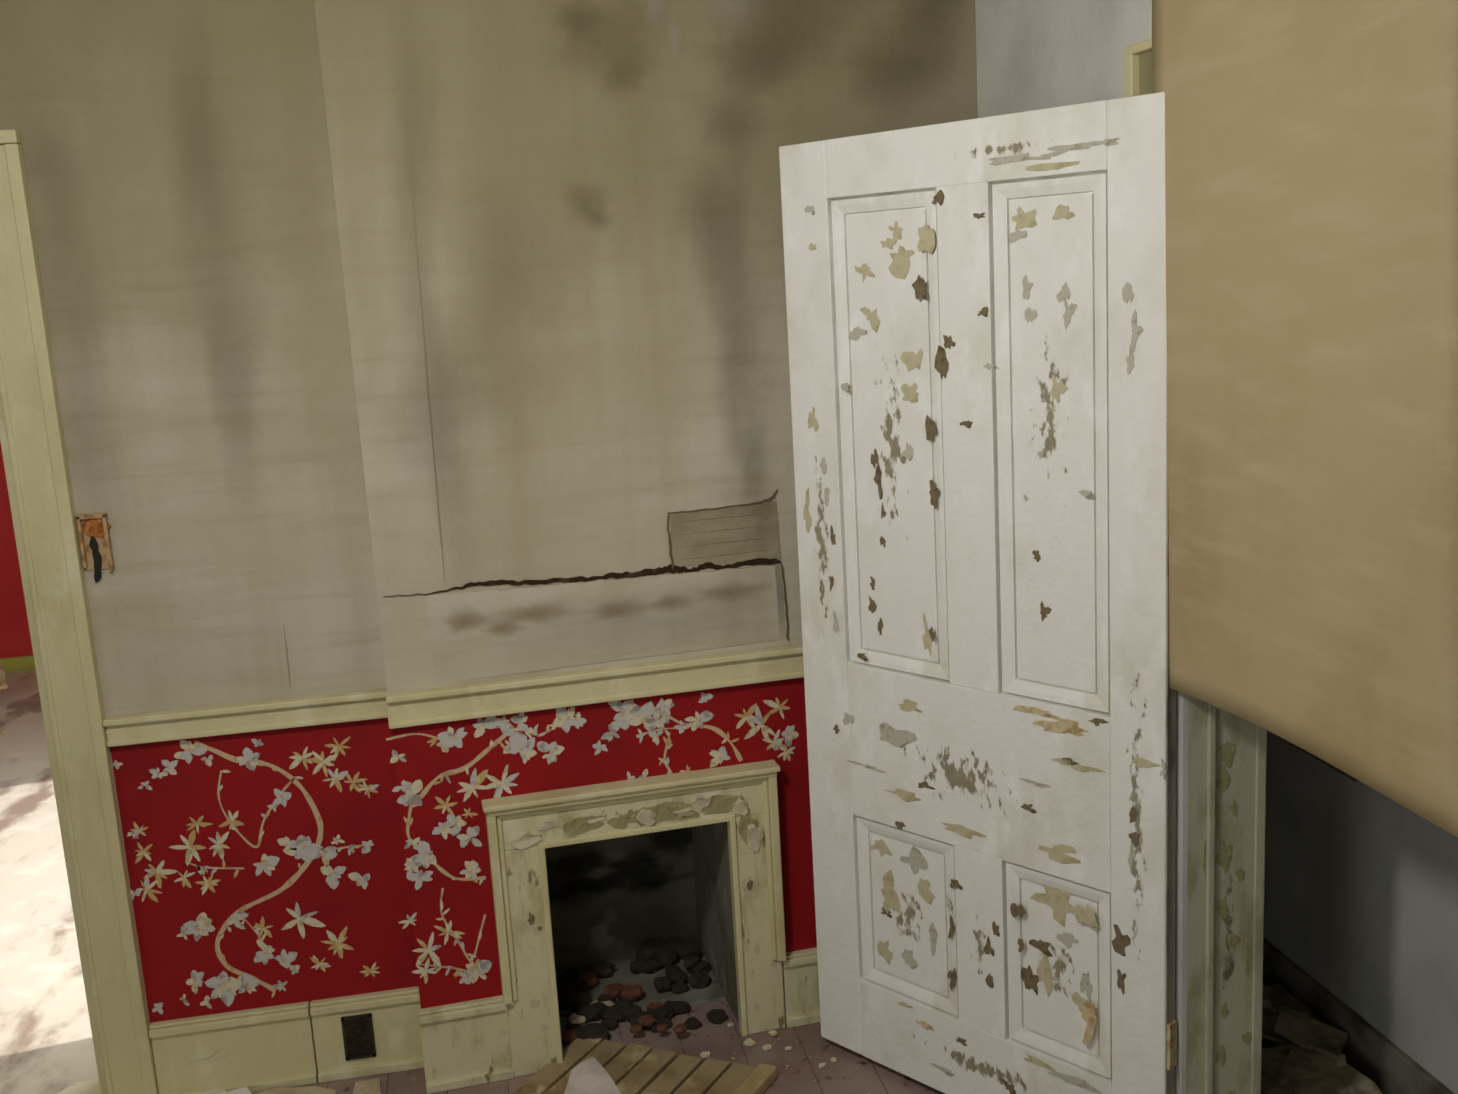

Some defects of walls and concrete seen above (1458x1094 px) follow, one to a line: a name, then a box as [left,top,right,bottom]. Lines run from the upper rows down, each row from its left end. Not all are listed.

peeling [973,138,1120,171]
peeling [854,221,935,300]
crack [384,73,789,641]
peeling [871,335,956,547]
peeling [1033,353,1068,459]
peeling [803,457,839,633]
peeling [846,722,1051,813]
peeling [1013,706,1108,736]
peeling [1127,703,1167,897]
peeling [870,839,963,969]
peeling [973,884,1135,1046]
peeling [931,1037,1101,1094]